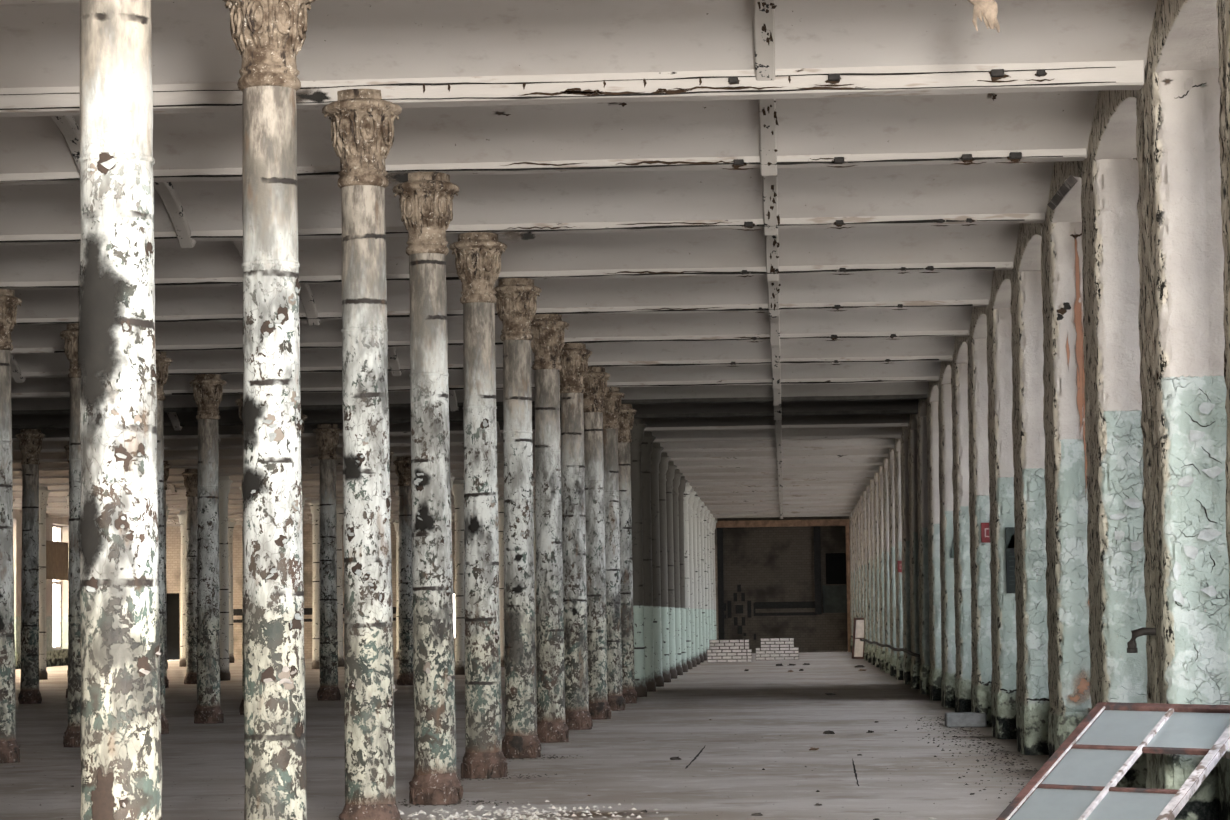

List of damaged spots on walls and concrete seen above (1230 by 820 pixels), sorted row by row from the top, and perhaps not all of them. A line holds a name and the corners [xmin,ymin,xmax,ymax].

peeling [87,152,116,175]
peeling [260,277,301,337]
peeling [120,318,132,333]
peeling [262,391,303,442]
peeling [114,443,145,472]
peeling [114,514,137,541]
peeling [274,535,288,549]
peeling [85,577,98,592]
peeling [266,566,279,580]
peeling [288,611,302,631]
peeling [137,645,161,677]
peeling [260,665,298,690]